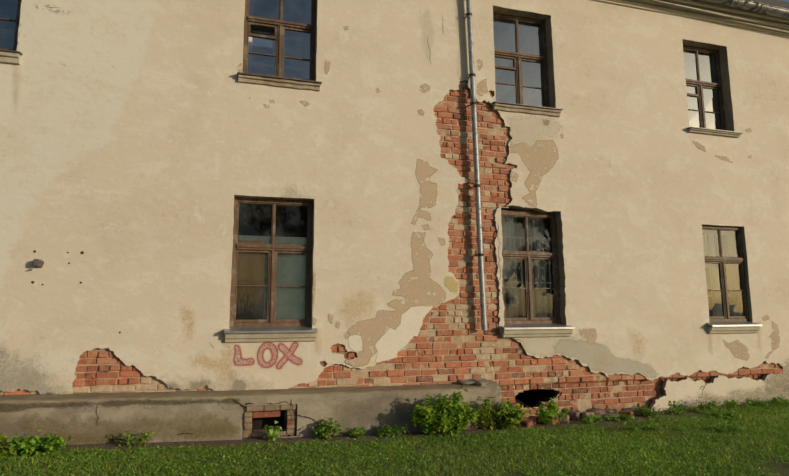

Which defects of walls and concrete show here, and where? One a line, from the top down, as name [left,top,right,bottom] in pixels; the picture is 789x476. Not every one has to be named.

flaking render [73,348,214,393]
flaking render [291,79,783,418]